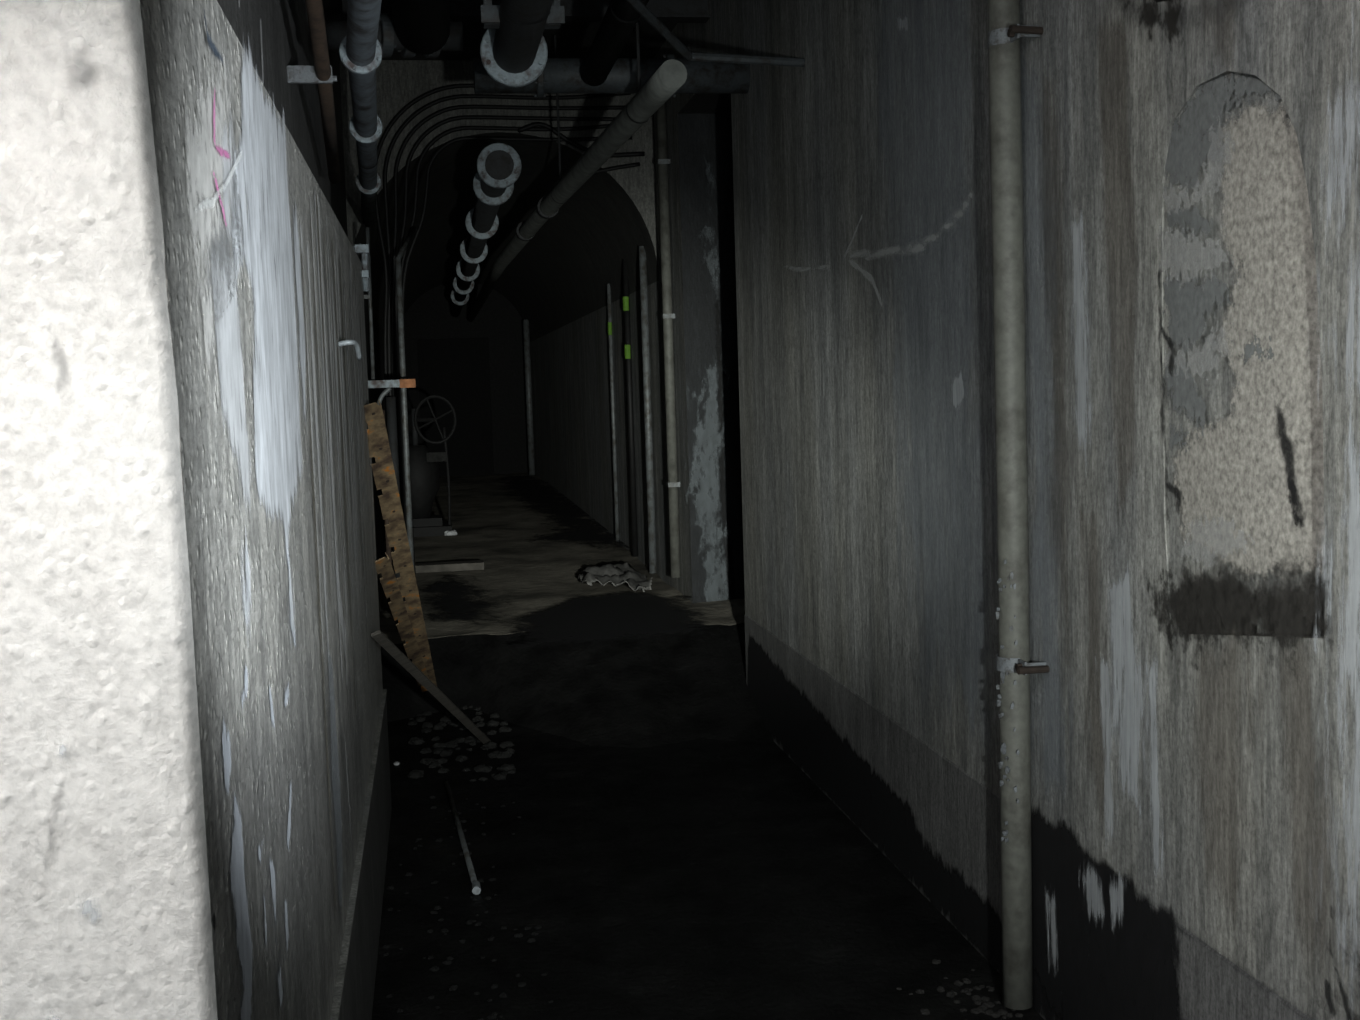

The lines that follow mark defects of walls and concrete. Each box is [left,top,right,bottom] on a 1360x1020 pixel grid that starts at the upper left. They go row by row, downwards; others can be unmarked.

peeling [1164,72,1281,244]
damp [1327,96,1359,219]
peeling [1163,270,1230,456]
peeling [1241,330,1274,365]
damp [1347,273,1360,375]
damp [1147,547,1332,669]
peeling [269,682,289,727]
damp [1338,425,1360,972]
peeling [222,720,289,1020]
damp [748,637,1002,974]
damp [1031,807,1182,1020]